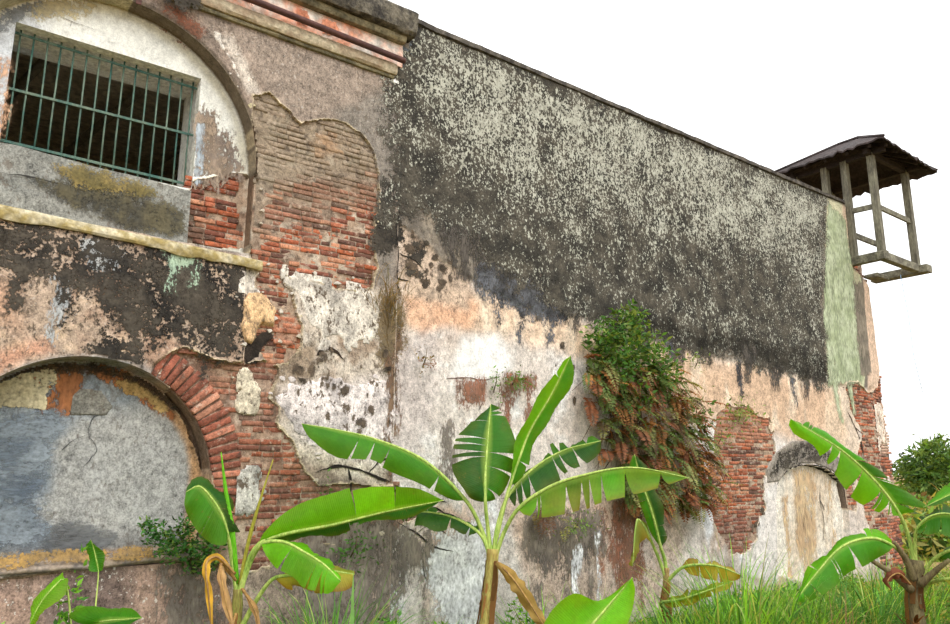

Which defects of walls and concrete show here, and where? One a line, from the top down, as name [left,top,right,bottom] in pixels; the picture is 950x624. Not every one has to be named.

flaking render [0,368,57,410]
crack [62,415,99,467]
damp [0,177,253,411]
flaking render [115,379,169,413]
spalling [151,94,400,573]
damp [368,211,430,279]
damp [438,225,582,346]
spalling [707,403,775,554]
damp [734,344,757,400]
damp [769,281,872,423]
spalling [843,376,905,575]